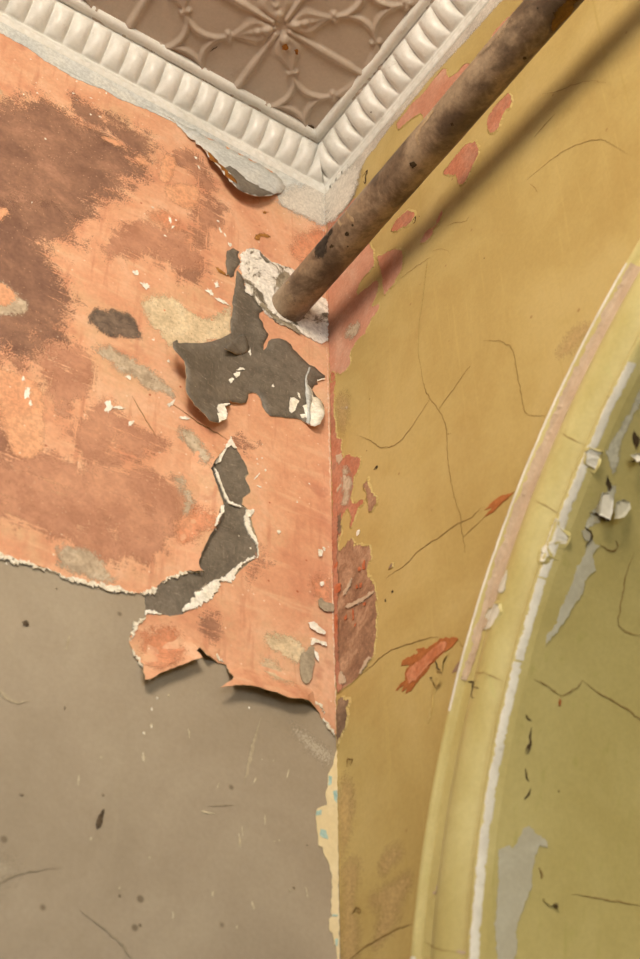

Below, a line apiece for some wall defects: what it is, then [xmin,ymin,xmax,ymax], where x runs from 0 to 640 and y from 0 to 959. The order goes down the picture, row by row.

peeling [396,61,471,130]
peeling [487,93,514,135]
peeling [443,139,481,187]
water stain [0,84,231,573]
crack [363,249,481,574]
crack [483,340,545,418]
flaking render [0,33,405,959]
peeling [396,262,640,711]
crack [601,541,638,635]
peeling [456,362,636,959]
crack [534,679,640,719]
crack [574,894,636,905]